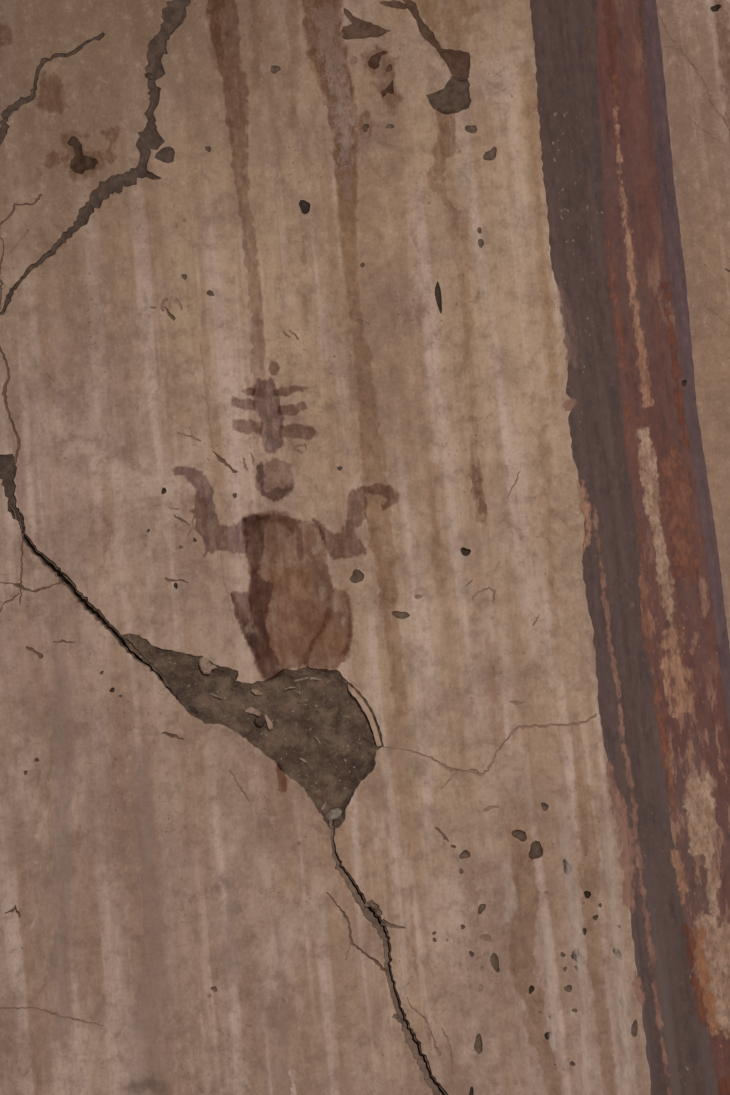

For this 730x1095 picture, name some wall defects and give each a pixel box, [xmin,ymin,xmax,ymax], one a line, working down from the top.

flaking render [341,8,390,40]
flaking render [350,51,394,97]
flaking render [379,0,471,115]
crack [0,0,191,315]
crack [150,298,183,321]
crack [176,432,255,473]
crack [0,347,181,702]
crack [169,507,195,537]
crack [162,732,184,740]
flaking render [120,633,384,829]
crack [327,819,456,1095]